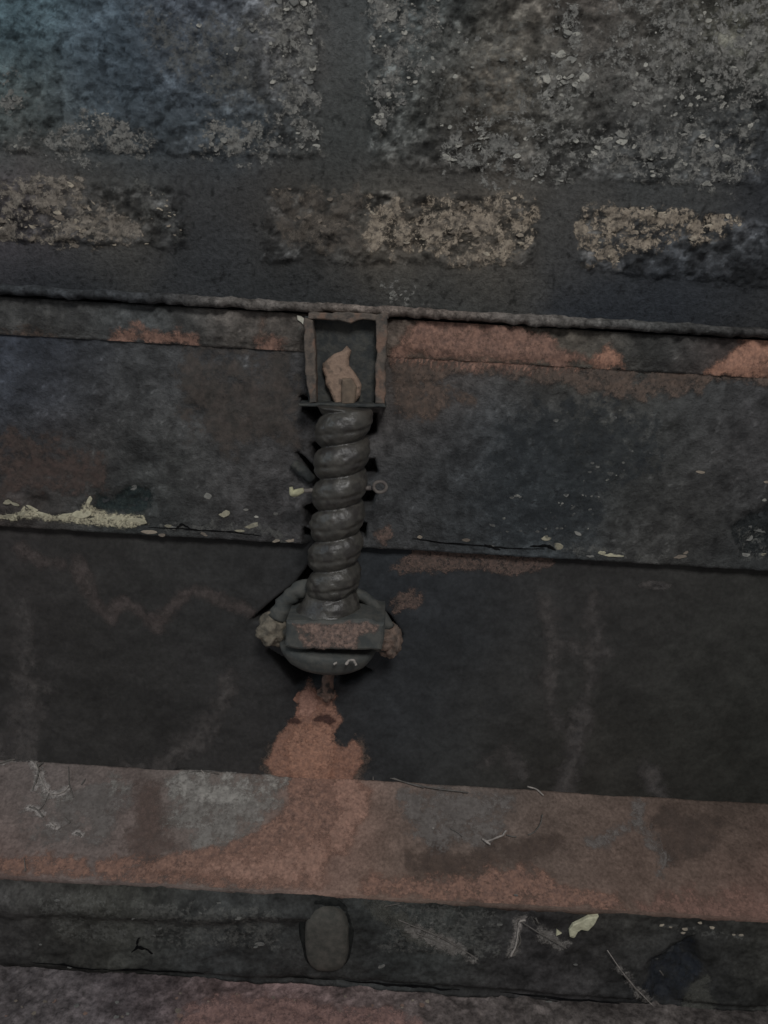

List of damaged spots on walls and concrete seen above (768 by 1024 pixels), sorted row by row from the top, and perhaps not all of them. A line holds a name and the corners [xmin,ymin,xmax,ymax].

corrosion [109,321,199,346]
corrosion [390,321,768,420]
peeling [0,496,176,537]
crack [412,538,556,551]
corrosion [137,679,372,889]
corrosion [359,863,768,919]